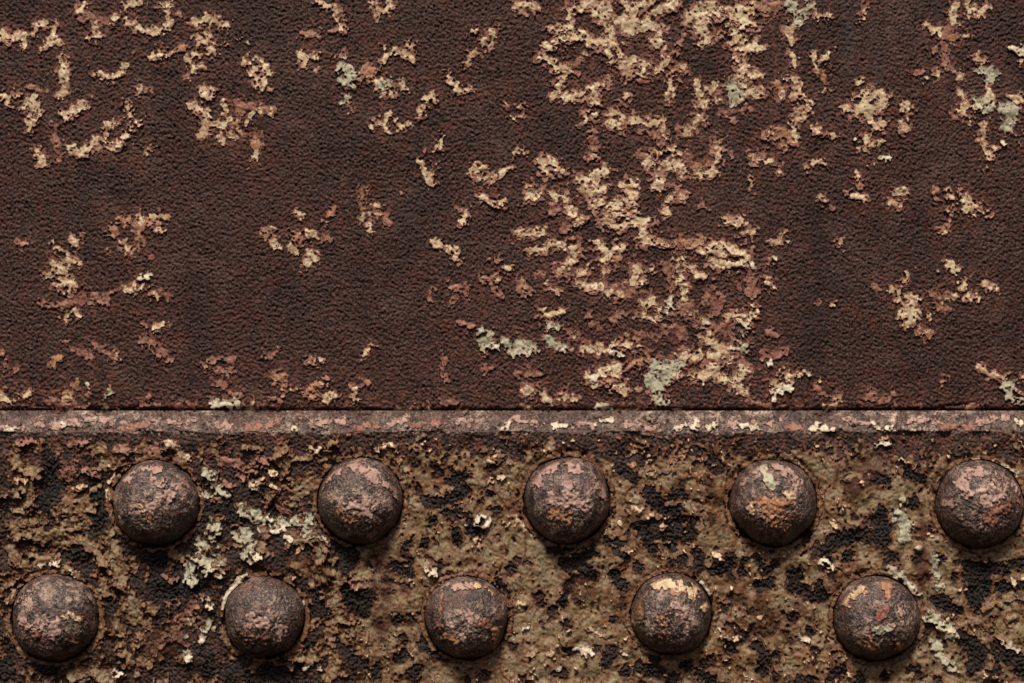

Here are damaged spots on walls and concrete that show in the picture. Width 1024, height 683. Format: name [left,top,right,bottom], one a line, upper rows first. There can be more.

peeling [36,207,176,370]
peeling [0,0,277,174]
peeling [258,204,337,275]
peeling [429,237,464,267]
corrosion [0,0,1024,415]
peeling [456,0,841,411]
peeling [814,71,918,212]
peeling [870,254,1001,345]
peeling [931,184,995,236]
peeling [906,0,1024,176]
peeling [0,351,1024,683]
corrosion [0,432,1024,683]